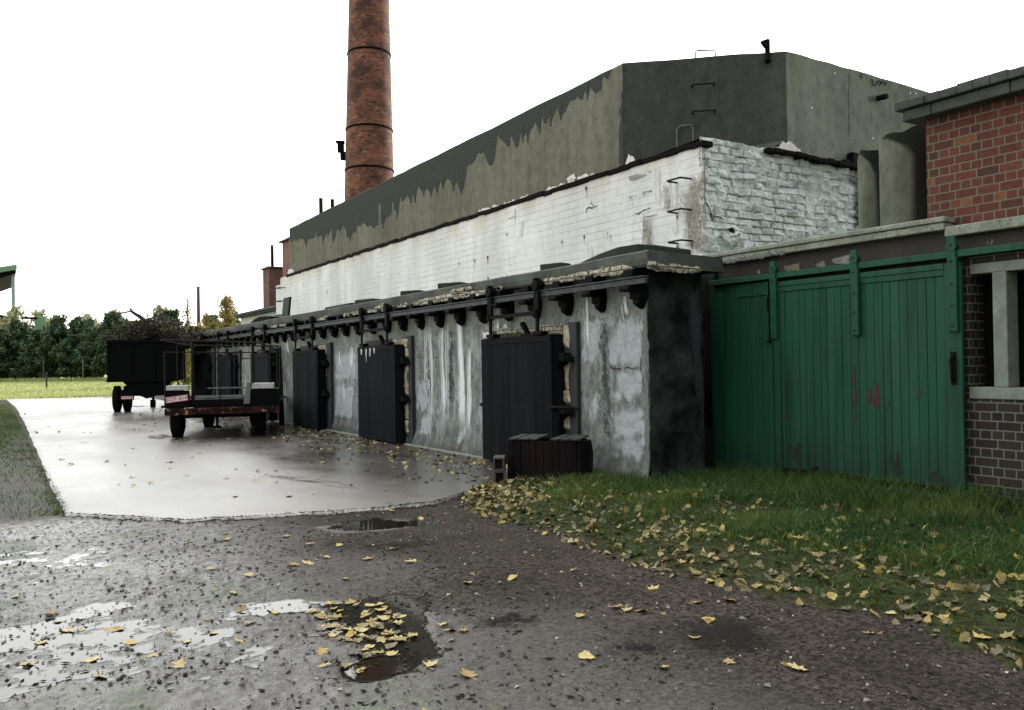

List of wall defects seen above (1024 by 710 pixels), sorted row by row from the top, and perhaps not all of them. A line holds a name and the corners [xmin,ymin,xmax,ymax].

peeling [546,173,595,191]
spalling [543,264,634,285]
spalling [647,260,702,274]
damp [424,325,472,426]
damp [586,299,611,449]